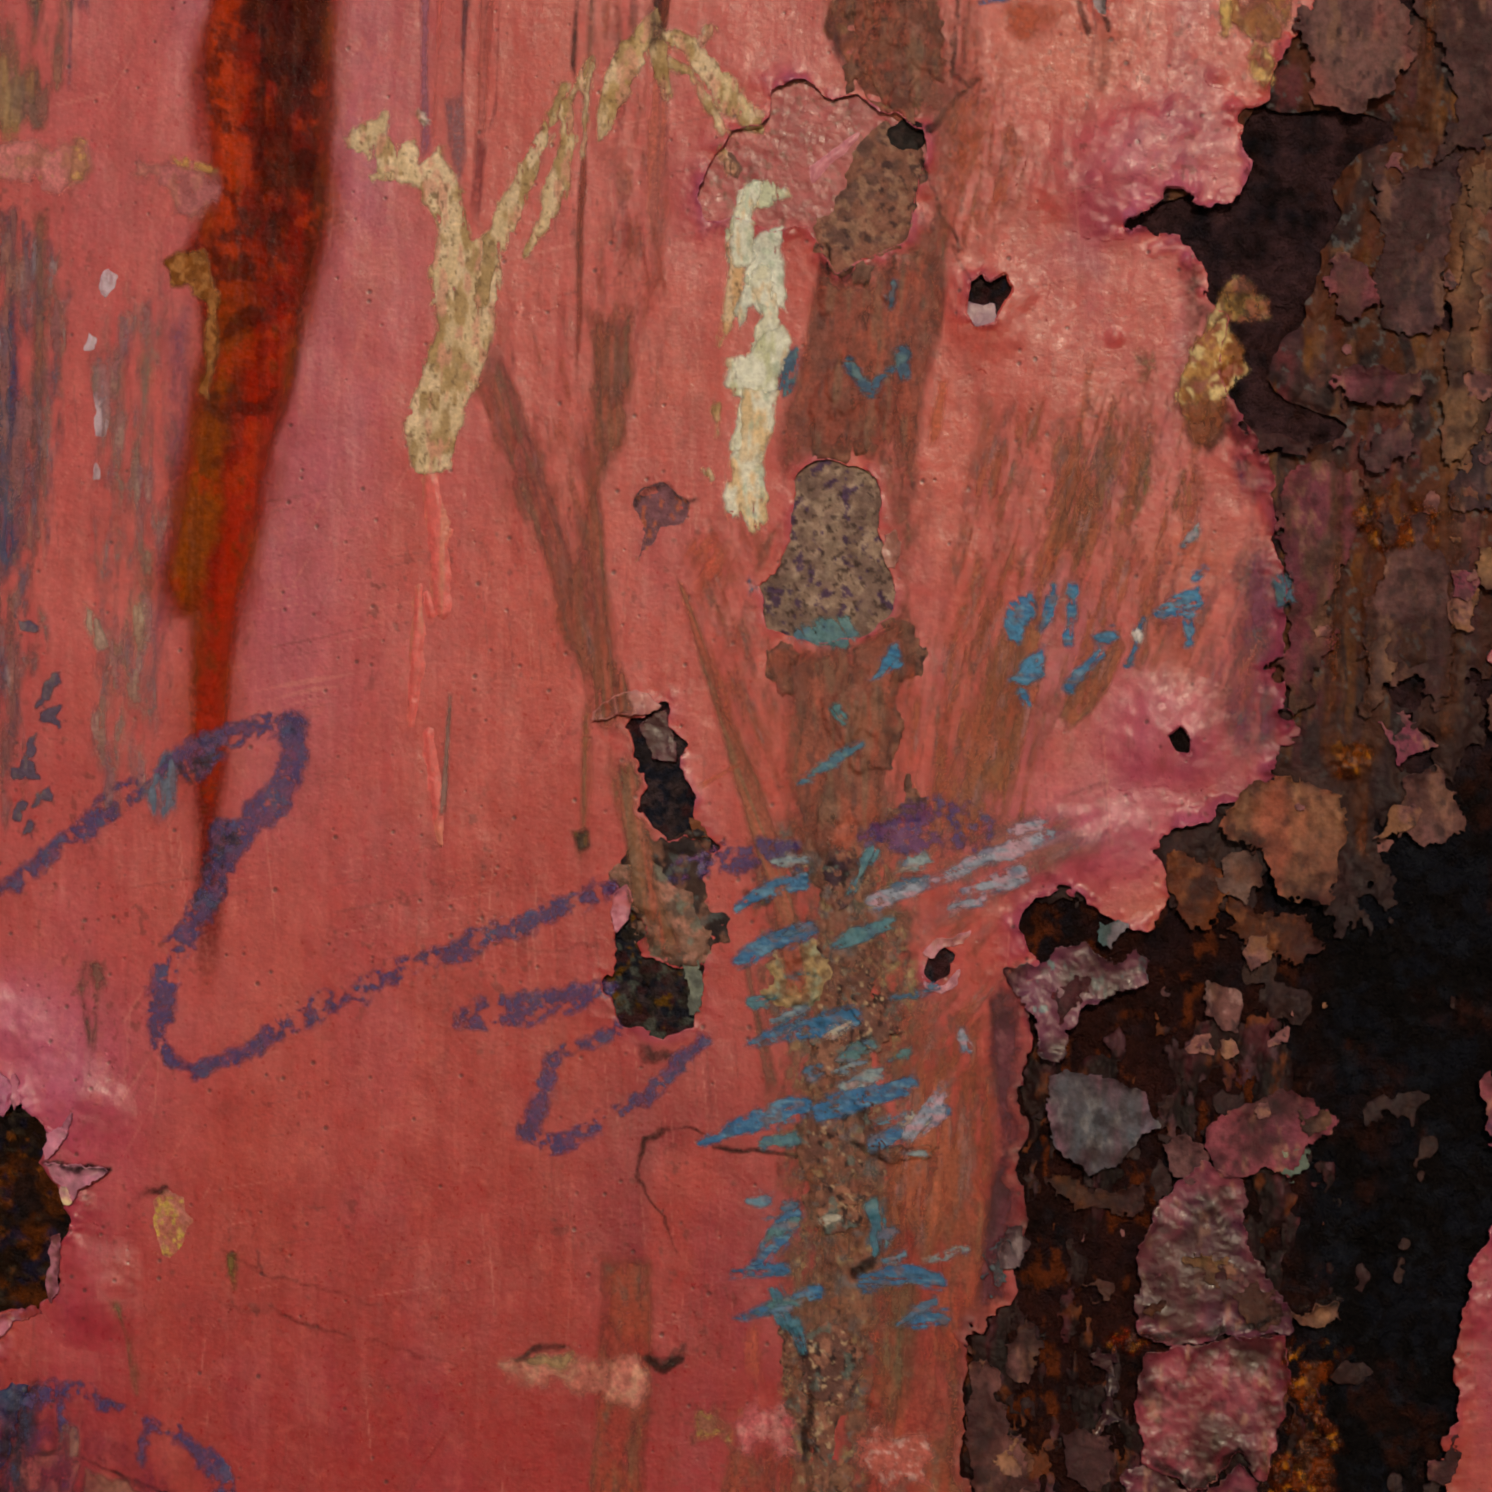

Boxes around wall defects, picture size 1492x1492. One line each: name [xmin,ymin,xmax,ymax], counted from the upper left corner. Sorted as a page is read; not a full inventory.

peeling [1292,0,1418,115]
rust [163,0,340,946]
peeling [698,0,981,859]
rust [1228,0,1492,939]
rust [1152,802,1268,915]
peeling [1215,776,1349,906]
peeling [1003,942,1150,1066]
crack [637,1127,795,1219]
rust [953,944,1313,1492]
peeling [1204,1089,1339,1179]
peeling [1133,1335,1292,1492]
rust [1226,1332,1373,1492]